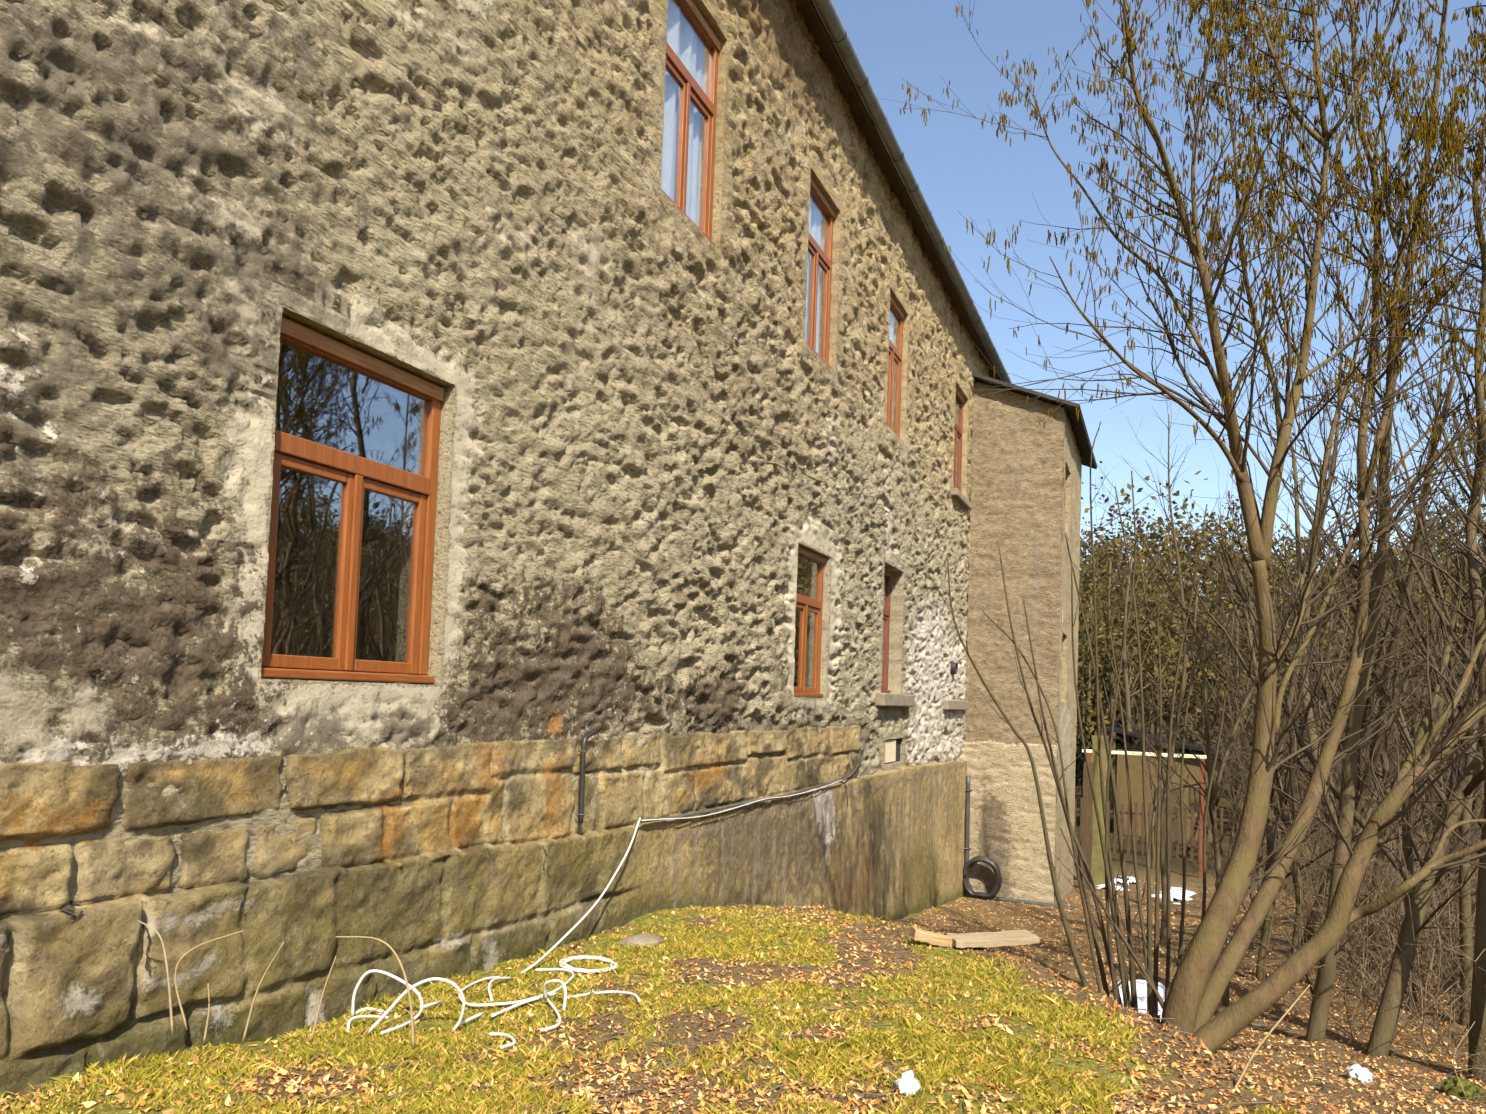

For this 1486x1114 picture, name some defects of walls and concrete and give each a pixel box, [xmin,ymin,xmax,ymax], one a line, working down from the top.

damp [0,0,369,793]
damp [411,557,746,747]
crack [59,894,118,925]
crack [142,922,164,977]